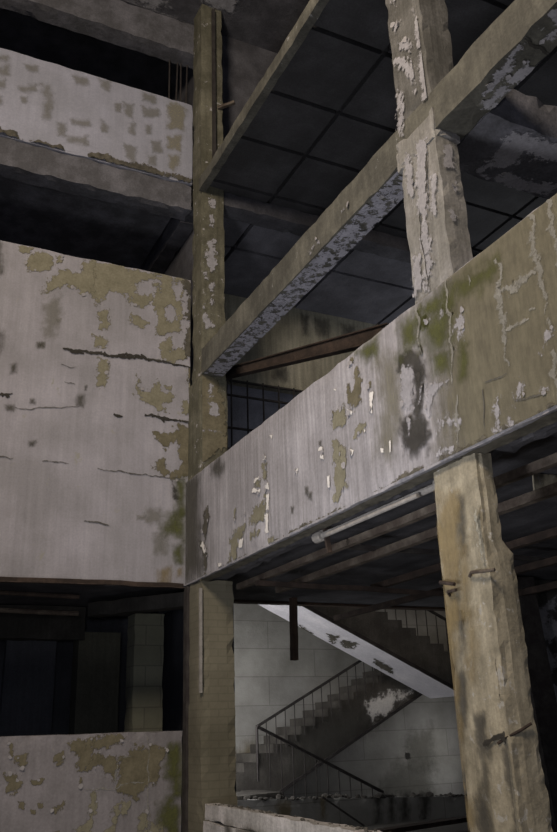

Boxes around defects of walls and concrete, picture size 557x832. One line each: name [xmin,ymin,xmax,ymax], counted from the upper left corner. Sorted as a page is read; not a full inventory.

peeling [480,44,535,110]
damp [546,199,557,250]
crack [0,392,79,410]
peeling [18,245,191,387]
crack [62,348,190,384]
crack [145,413,189,423]
peeling [202,171,404,470]
damp [376,307,431,455]
damp [445,280,453,382]
damp [494,214,553,364]
crack [97,468,185,480]
spalling [189,357,557,586]